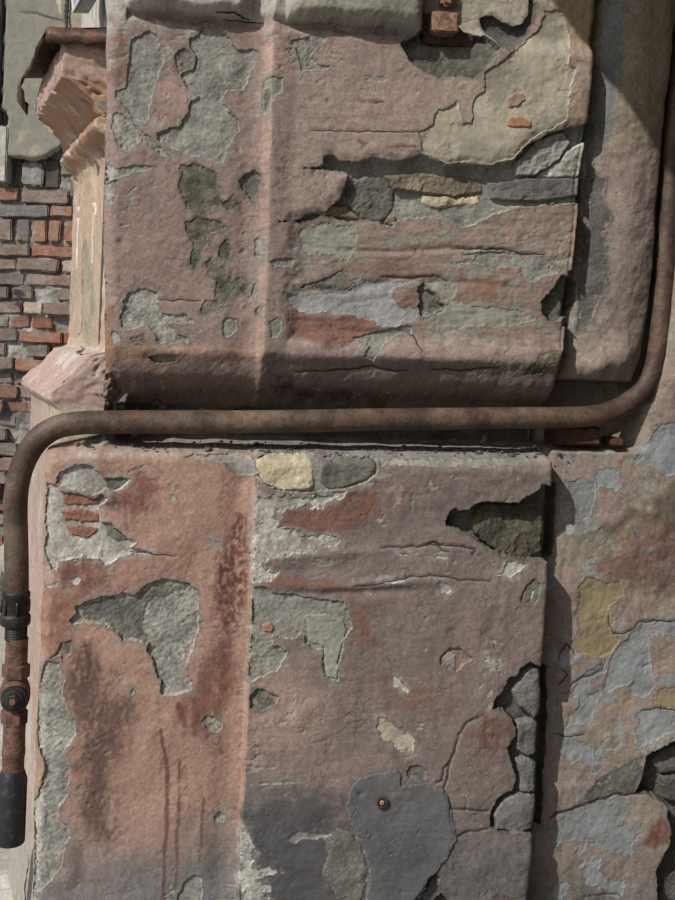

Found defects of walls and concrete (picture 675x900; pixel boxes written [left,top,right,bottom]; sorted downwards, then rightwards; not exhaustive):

spalling [97,27,259,164]
flaking render [254,0,627,362]
spalling [44,464,152,588]
spalling [69,578,200,696]
spalling [184,450,521,713]
crack [354,574,487,587]
crack [381,541,476,556]
spalling [445,482,557,578]
rust [159,729,180,898]
leakage [255,800,333,900]
crack [436,715,489,838]
spalling [489,618,675,900]